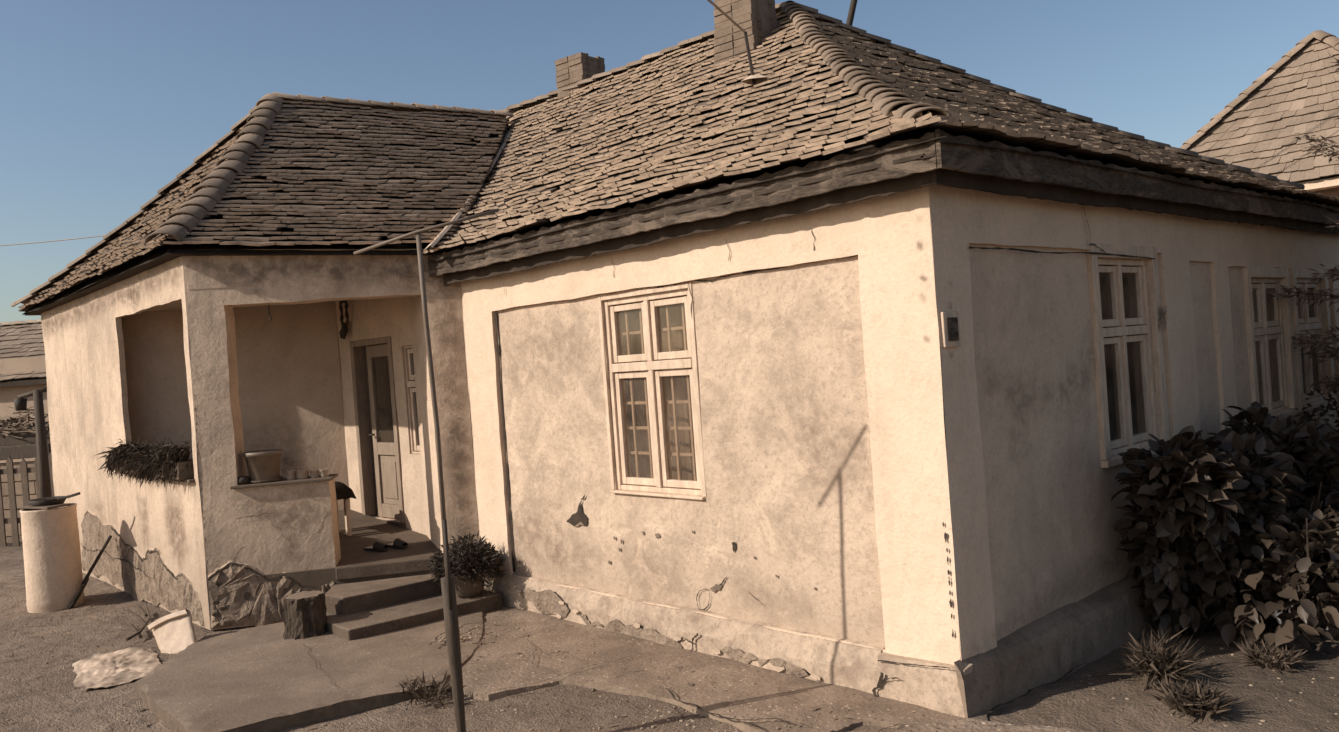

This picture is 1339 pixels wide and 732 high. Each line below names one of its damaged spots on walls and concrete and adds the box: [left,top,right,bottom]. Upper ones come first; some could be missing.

spalling [567,495,587,527]
spalling [80,475,336,629]
spalling [515,588,682,649]
crack [872,660,950,697]